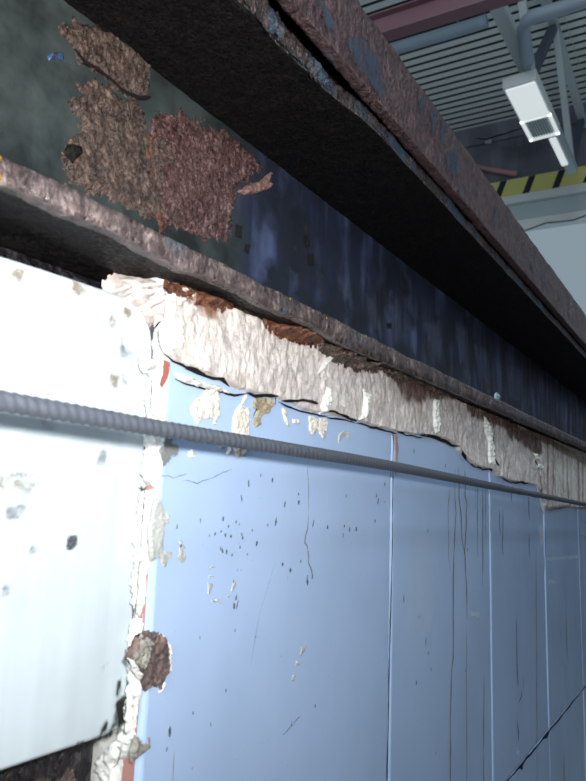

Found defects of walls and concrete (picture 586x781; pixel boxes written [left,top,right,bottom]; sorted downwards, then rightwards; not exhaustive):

rust [54,15,263,243]
peeling [190,389,221,426]
peeling [226,447,248,458]
peeling [232,394,328,440]
rust [463,402,586,497]
peeling [146,496,186,567]
water stain [448,468,503,695]